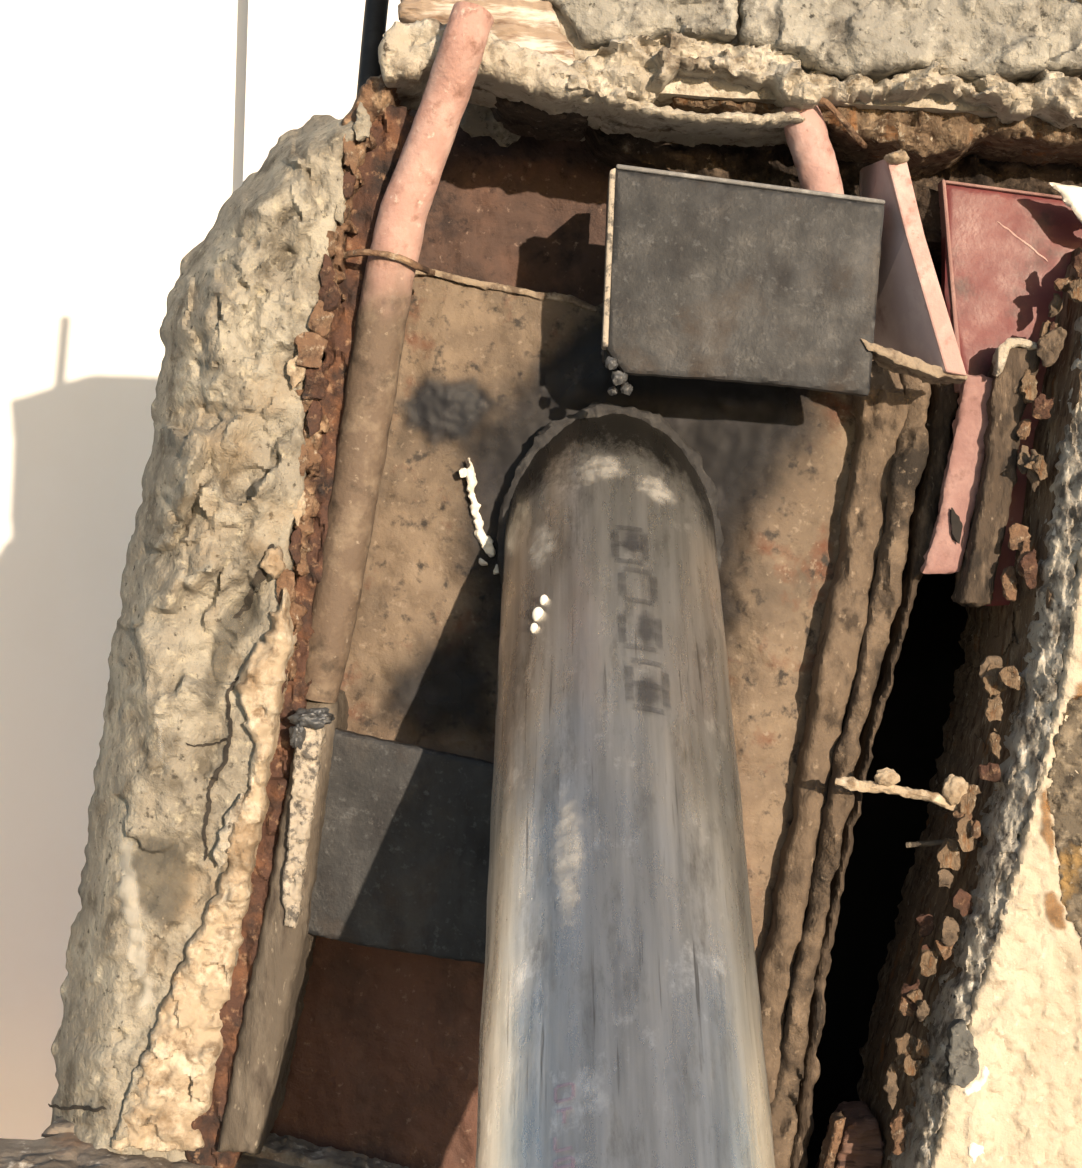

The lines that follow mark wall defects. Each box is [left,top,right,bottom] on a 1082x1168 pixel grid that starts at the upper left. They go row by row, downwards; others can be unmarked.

peeling [1016,251,1082,492]
crack [234,544,275,618]
corrosion [276,400,330,715]
peeling [1000,523,1038,602]
crack [186,676,239,861]
spalling [807,572,968,1168]
peeling [883,655,1024,1155]
spalling [1046,697,1082,949]
peeling [41,1116,75,1138]
peeling [242,1133,408,1168]
peeling [968,1142,984,1163]